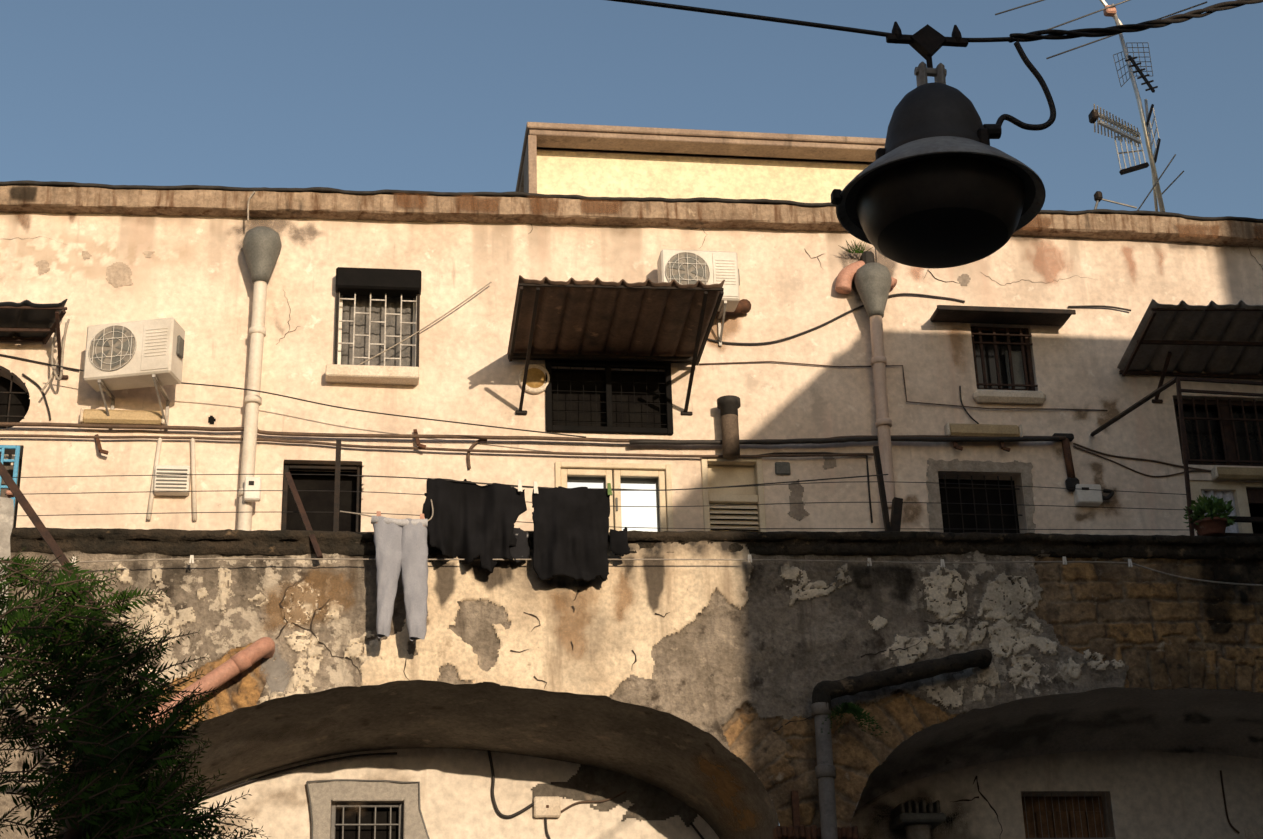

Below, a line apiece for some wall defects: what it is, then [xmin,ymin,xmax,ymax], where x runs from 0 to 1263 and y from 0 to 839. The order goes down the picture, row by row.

flaking render [114,564,232,649]
spalling [138,643,252,719]
spalling [163,582,344,730]
flaking render [407,640,418,656]
flaking render [437,663,473,684]
flaking render [447,598,511,671]
flaking render [610,679,638,703]
flaking render [780,563,852,606]
spalling [830,556,1263,828]
damp [1202,558,1233,634]
flaking render [531,764,698,827]
spalling [721,702,821,828]